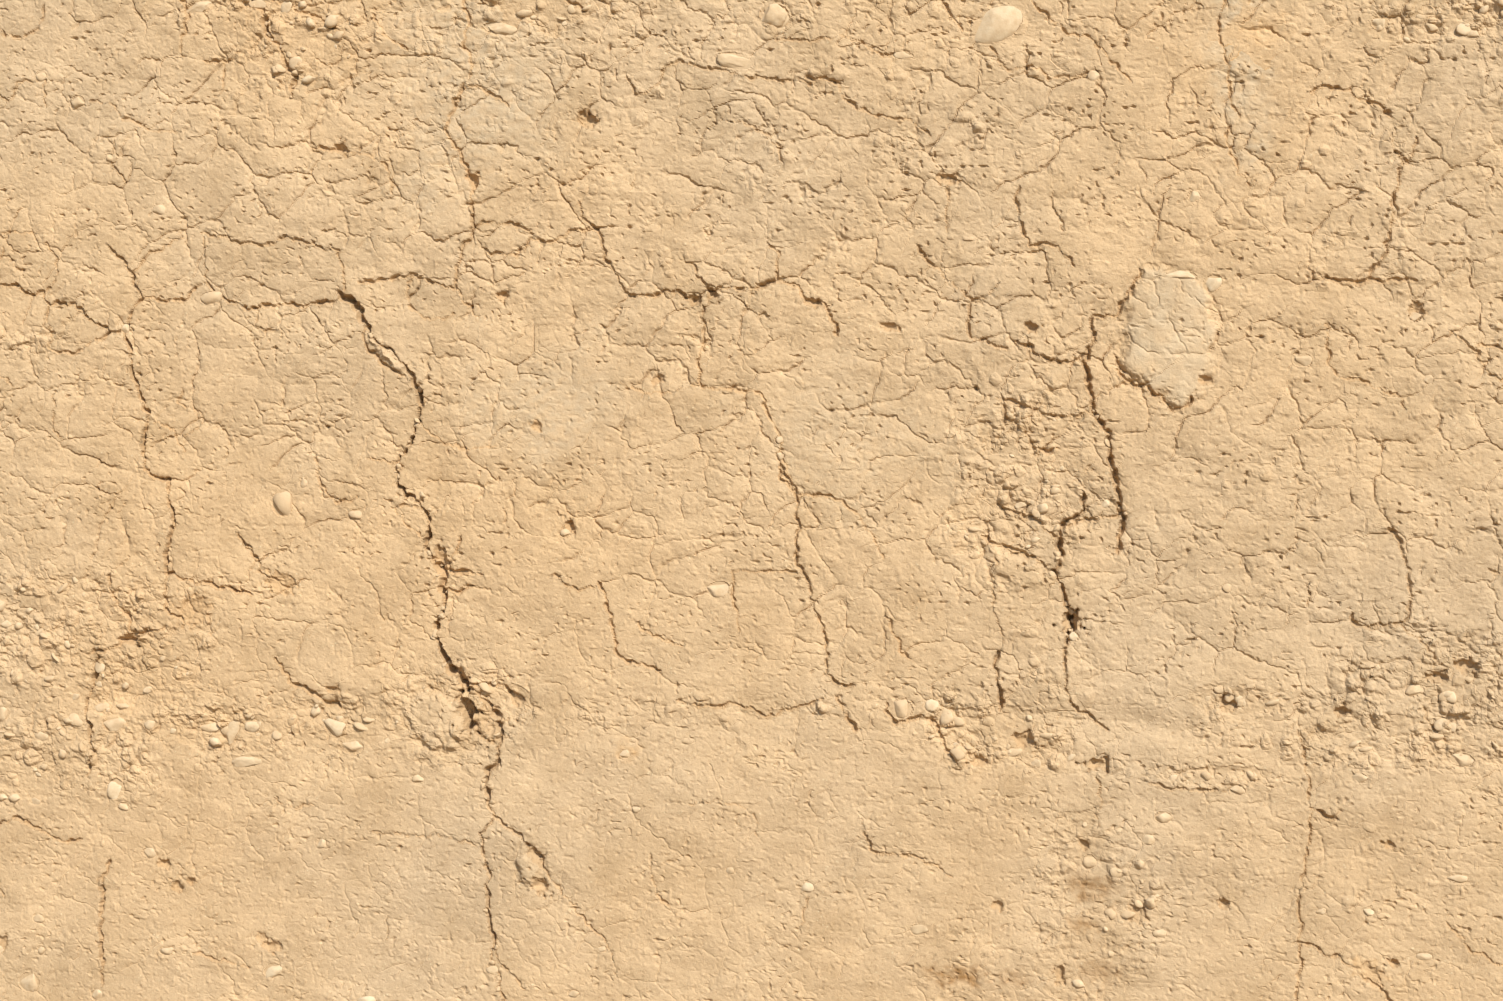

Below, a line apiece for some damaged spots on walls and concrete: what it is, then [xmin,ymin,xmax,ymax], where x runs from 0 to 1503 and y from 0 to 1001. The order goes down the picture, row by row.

crack [1309,84,1420,288]
crack [0,0,958,1001]
crack [916,175,1194,733]
crack [1308,323,1405,409]
crack [1449,331,1503,383]
crack [1488,568,1503,576]